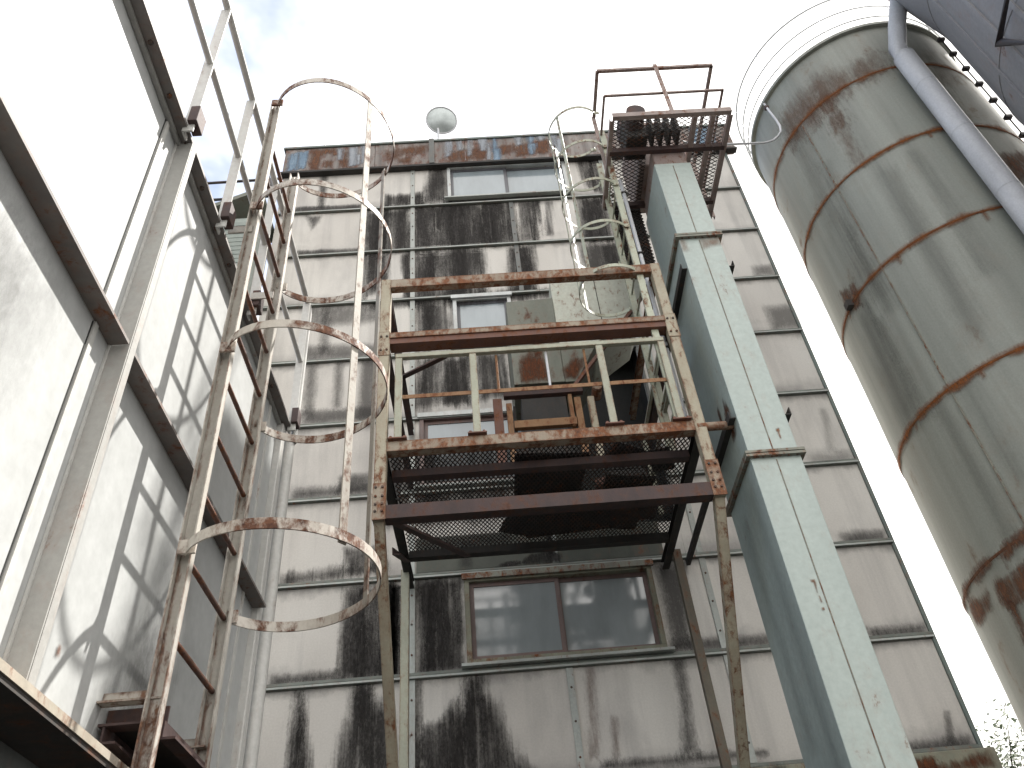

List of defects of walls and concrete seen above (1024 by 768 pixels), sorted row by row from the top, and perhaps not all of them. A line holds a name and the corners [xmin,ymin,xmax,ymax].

corrosion [309,149,349,170]
damp [295,169,551,308]
corrosion [449,140,550,161]
damp [578,161,620,268]
corrosion [803,126,944,276]
corrosion [840,206,996,350]
corrosion [1002,153,1024,181]
corrosion [519,344,548,383]
corrosion [564,357,584,378]
corrosion [897,344,1024,473]
damp [272,583,401,768]
damp [415,578,529,768]